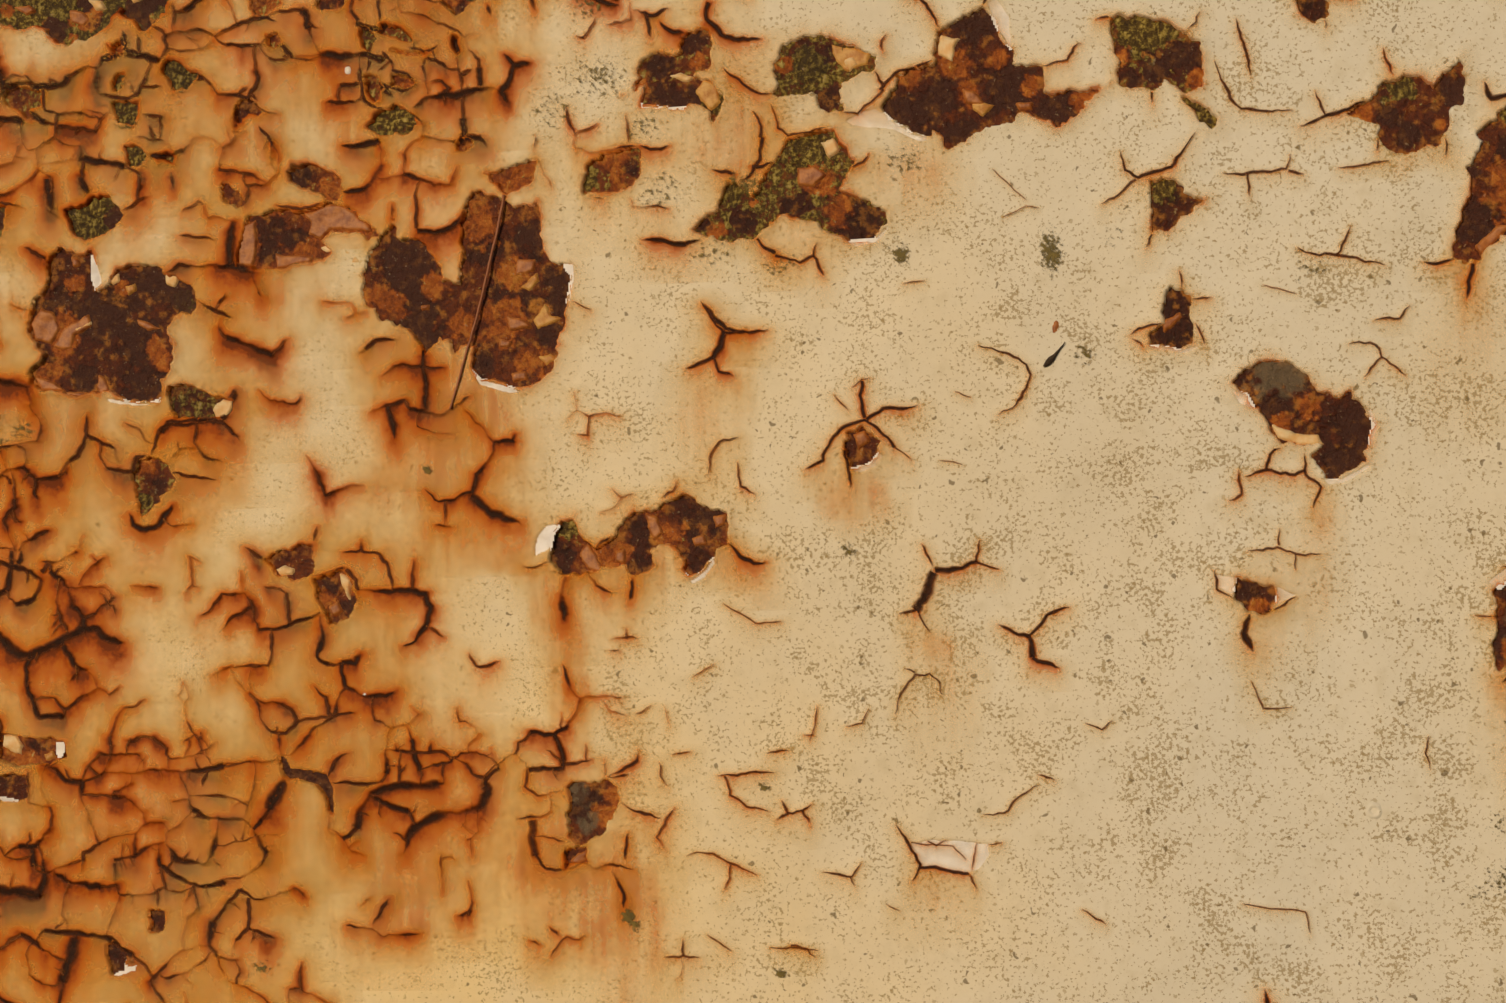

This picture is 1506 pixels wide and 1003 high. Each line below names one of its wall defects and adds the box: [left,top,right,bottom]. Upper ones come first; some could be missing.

corrosion [0,0,203,169]
crack [0,0,630,424]
corrosion [582,144,671,203]
corrosion [0,159,574,567]
crack [687,302,767,382]
crack [0,343,649,1003]
corrosion [219,538,481,957]
corrosion [525,485,768,714]
crack [719,669,941,826]
crack [901,542,997,631]
corrosion [508,755,674,955]
peeling [897,826,999,887]